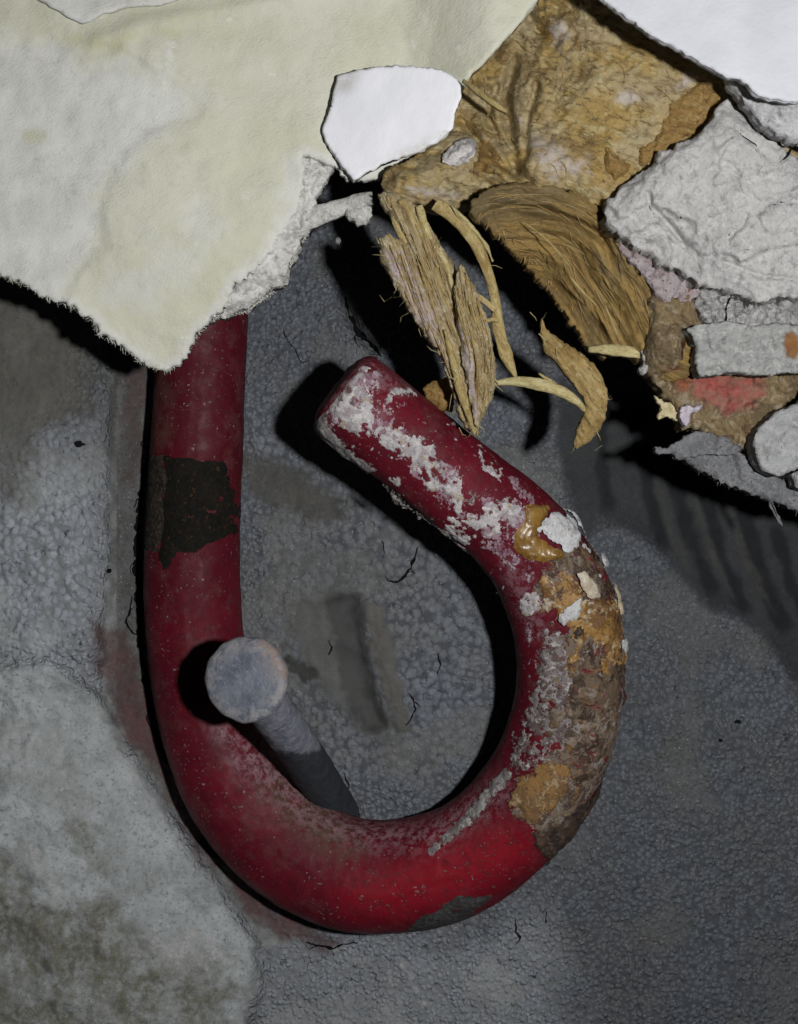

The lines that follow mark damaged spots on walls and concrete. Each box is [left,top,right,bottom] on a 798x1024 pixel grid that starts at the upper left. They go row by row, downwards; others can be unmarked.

spalling [322,65,511,181]
peeling [604,81,719,182]
peeling [652,431,798,513]
rust [508,542,627,867]